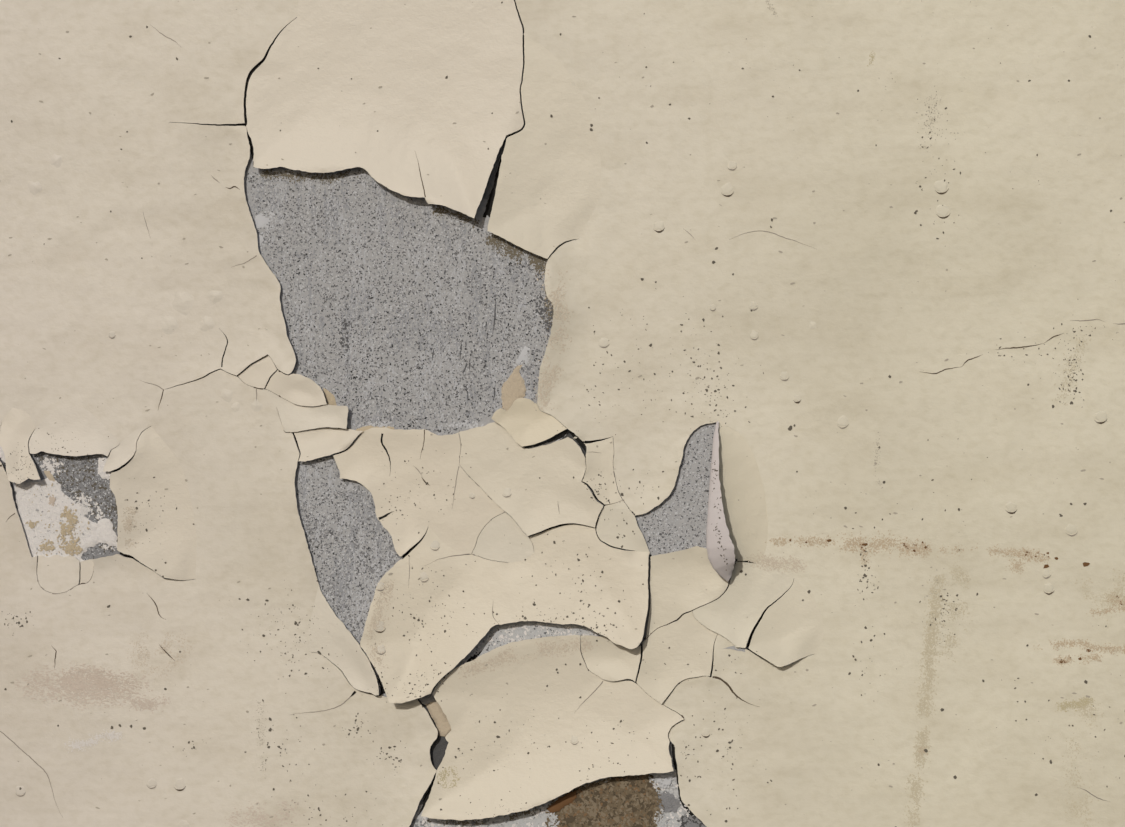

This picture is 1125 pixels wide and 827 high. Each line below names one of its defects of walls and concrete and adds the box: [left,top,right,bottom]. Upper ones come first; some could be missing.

peeling [0,407,197,593]
peeling [152,0,824,827]
crack [923,319,1125,374]
leakage [895,549,978,827]